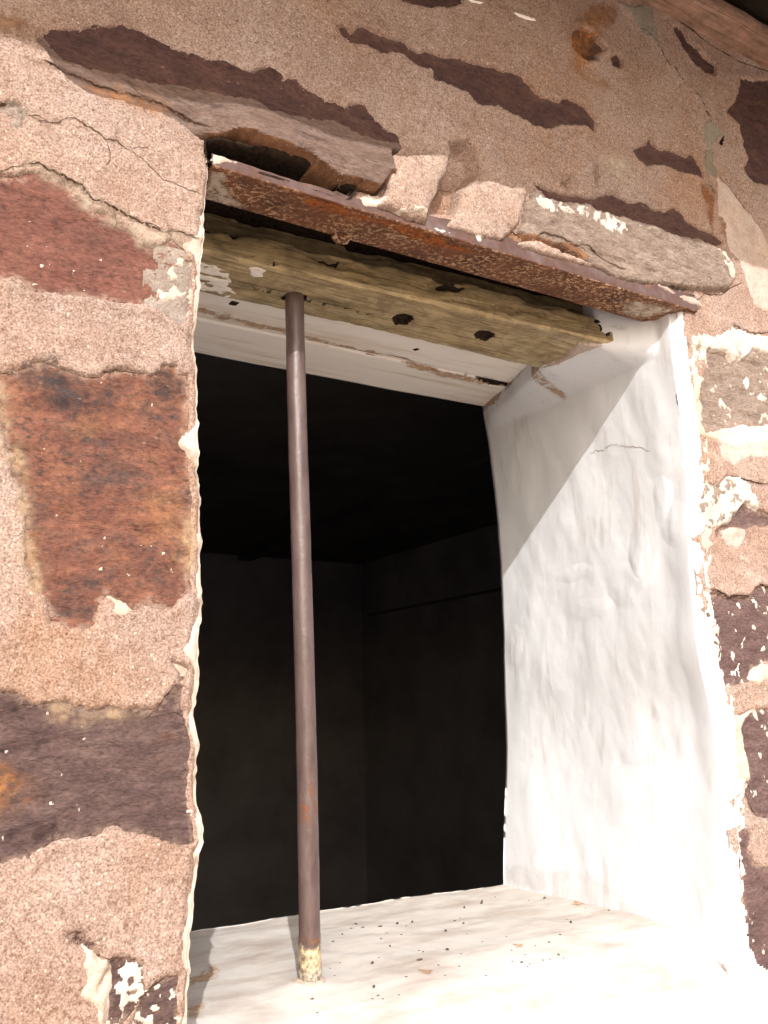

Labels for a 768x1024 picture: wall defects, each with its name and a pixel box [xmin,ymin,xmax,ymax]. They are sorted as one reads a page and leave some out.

crack [0,103,199,193]
flaking render [0,174,198,324]
crack [0,161,200,252]
corrosion [298,196,473,253]
flaking render [534,184,722,246]
flaking render [699,351,768,433]
flaking render [715,503,768,537]
flaking render [706,585,768,687]
flaking render [741,709,768,819]
flaking render [726,830,768,970]
flaking render [68,931,185,1024]